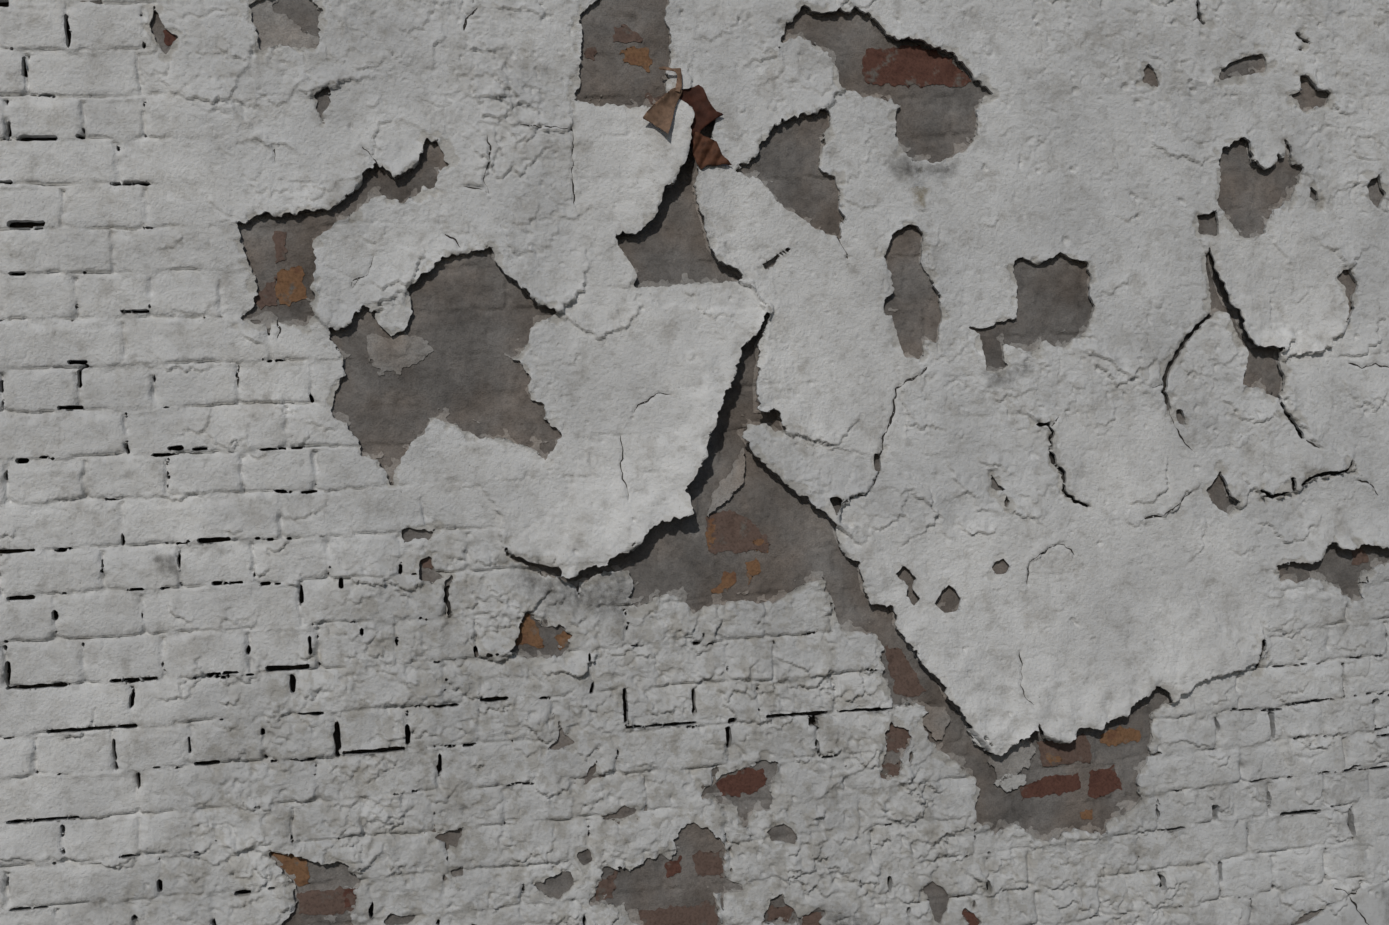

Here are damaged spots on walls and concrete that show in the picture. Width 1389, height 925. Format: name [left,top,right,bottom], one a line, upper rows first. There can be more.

peeling [249,0,323,51]
peeling [314,87,331,124]
peeling [237,139,448,333]
peeling [328,0,1389,844]
crack [1036,418,1087,507]
crack [1153,314,1212,450]
crack [1260,392,1378,498]
peeling [269,851,361,925]
peeling [424,824,463,881]
peeling [523,822,743,925]